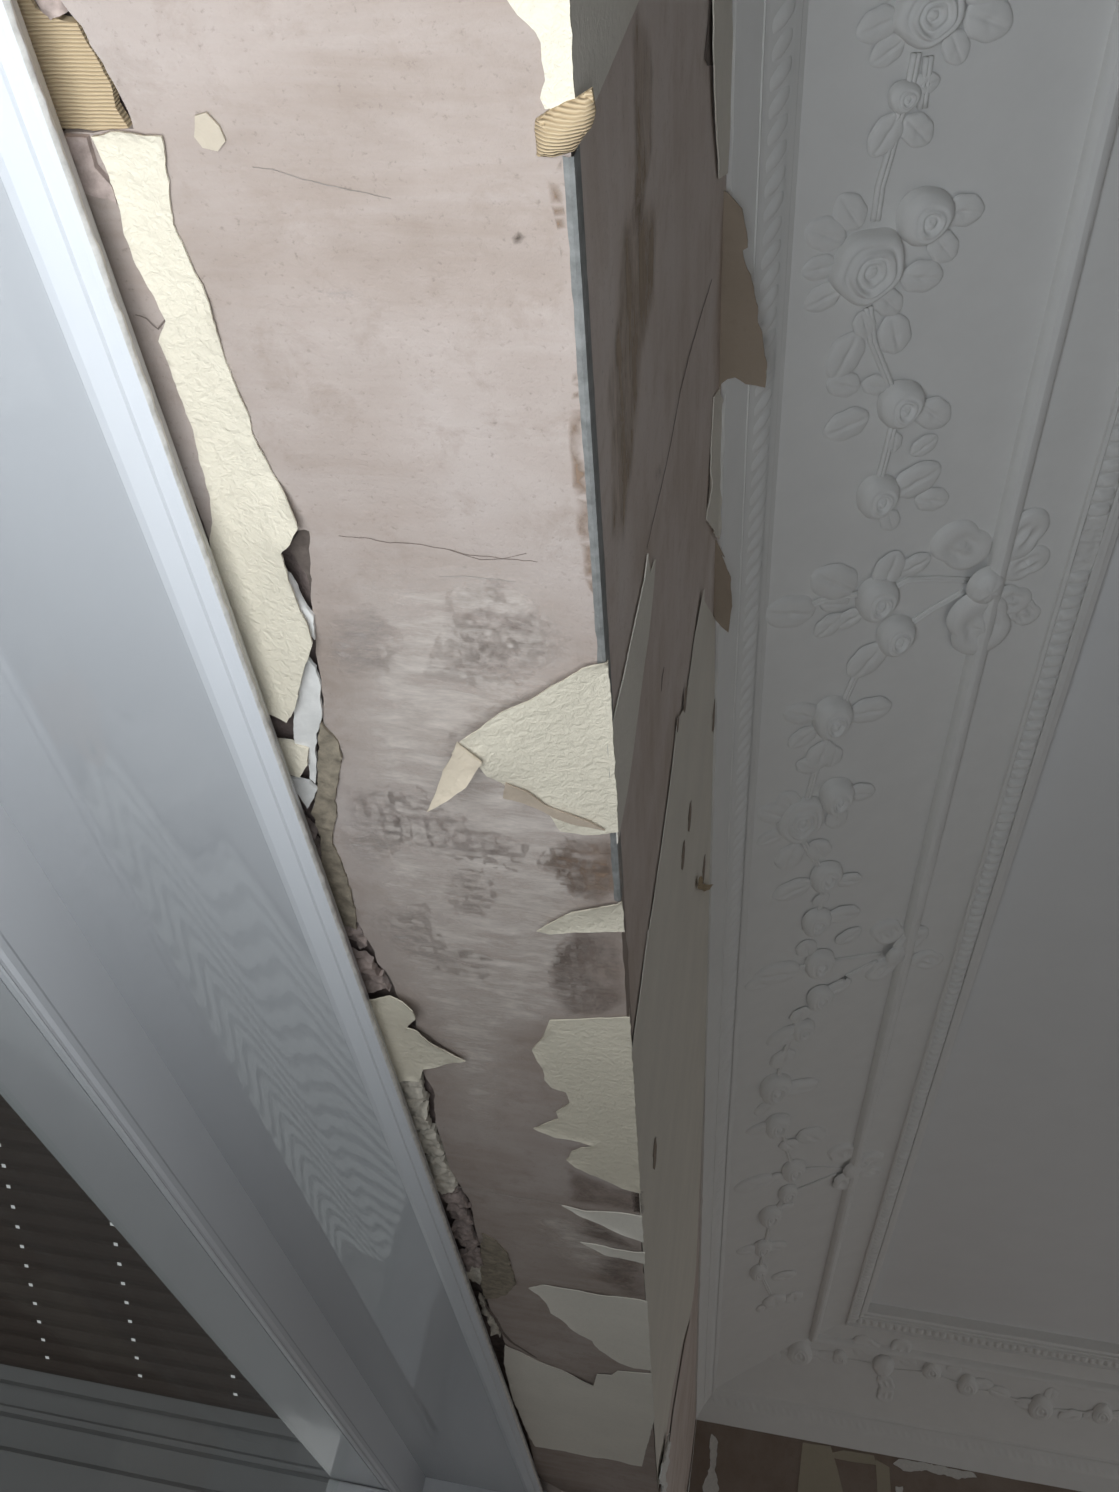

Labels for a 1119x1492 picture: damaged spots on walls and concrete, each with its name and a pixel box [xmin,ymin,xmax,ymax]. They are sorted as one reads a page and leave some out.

flaking render [34,0,68,20]
flaking render [64,133,118,204]
damp [614,103,654,525]
crack [341,536,536,582]
flaking render [399,1073,516,1337]